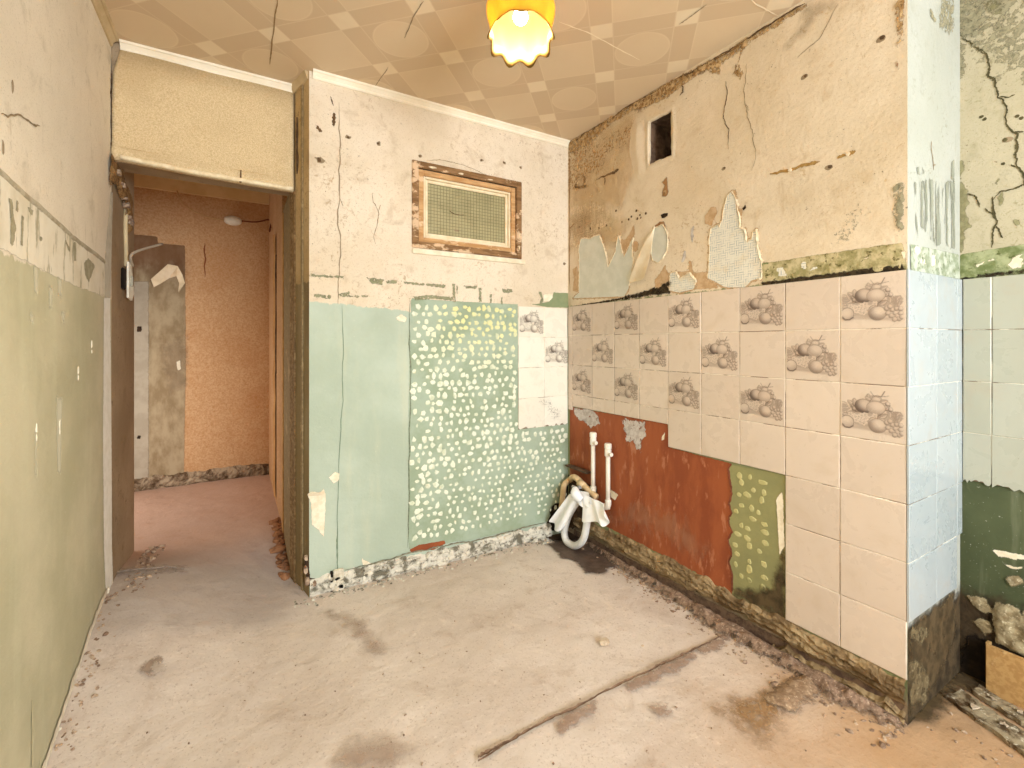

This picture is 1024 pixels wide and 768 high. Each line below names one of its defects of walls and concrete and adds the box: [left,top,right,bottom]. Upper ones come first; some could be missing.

flaking render [568,3,807,189]
crack [723,65,756,166]
crack [960,35,1024,247]
peeling [563,190,765,300]
crack [296,96,344,569]
flaking render [0,155,186,768]
flaking render [622,418,646,453]
leakage [546,531,615,574]
flaking render [303,463,908,736]
leakage [908,591,986,722]
spalling [960,595,1024,682]
peeling [993,550,1024,586]